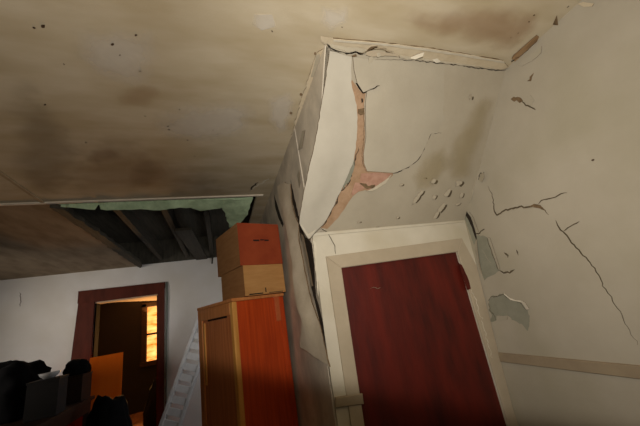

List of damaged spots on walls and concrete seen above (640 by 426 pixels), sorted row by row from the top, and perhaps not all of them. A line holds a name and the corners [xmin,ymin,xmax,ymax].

crack [326,43,506,71]
flaking render [297,36,508,239]
spalling [50,204,142,268]
spalling [475,235,500,280]
crack [488,187,638,343]
spalling [479,293,530,331]